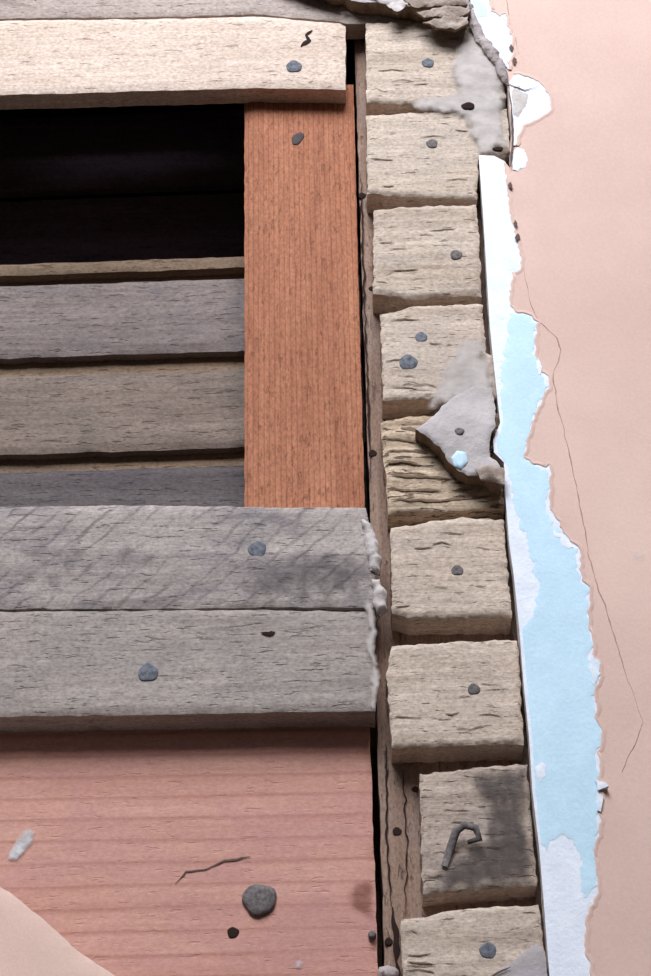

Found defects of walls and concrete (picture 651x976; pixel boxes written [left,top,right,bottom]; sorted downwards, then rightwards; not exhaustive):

peeling [451,451,468,469]
peeling [469,0,609,976]
crack [521,257,643,771]
leakage [445,770,529,884]